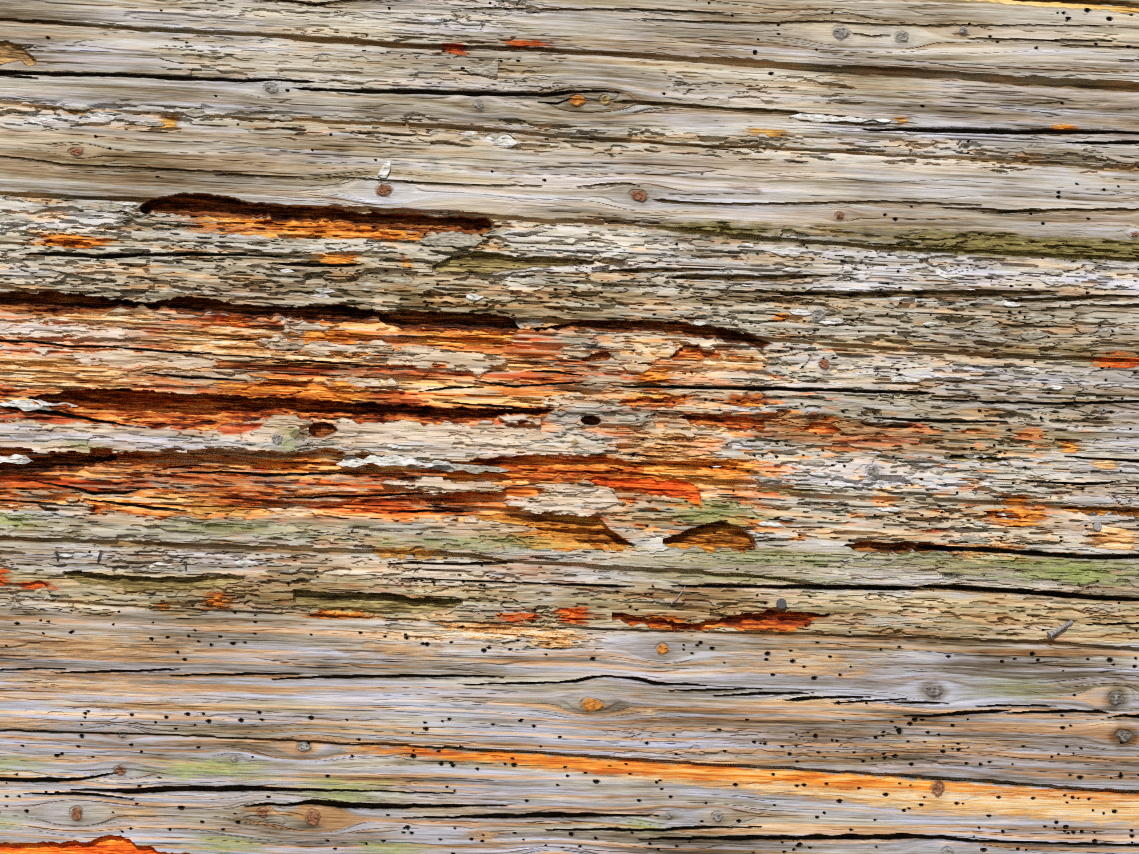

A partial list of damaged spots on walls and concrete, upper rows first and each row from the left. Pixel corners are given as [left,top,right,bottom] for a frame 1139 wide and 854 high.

crack [0,71,1139,145]
spalling [0,194,688,296]
spalling [0,277,770,377]
spalling [0,389,795,554]
spalling [47,554,297,592]
spalling [845,511,1023,555]
crack [916,545,1139,560]
spalling [1060,506,1139,518]
spalling [295,590,461,613]
spalling [612,610,828,632]
crack [0,668,1139,718]
crack [0,773,1139,846]